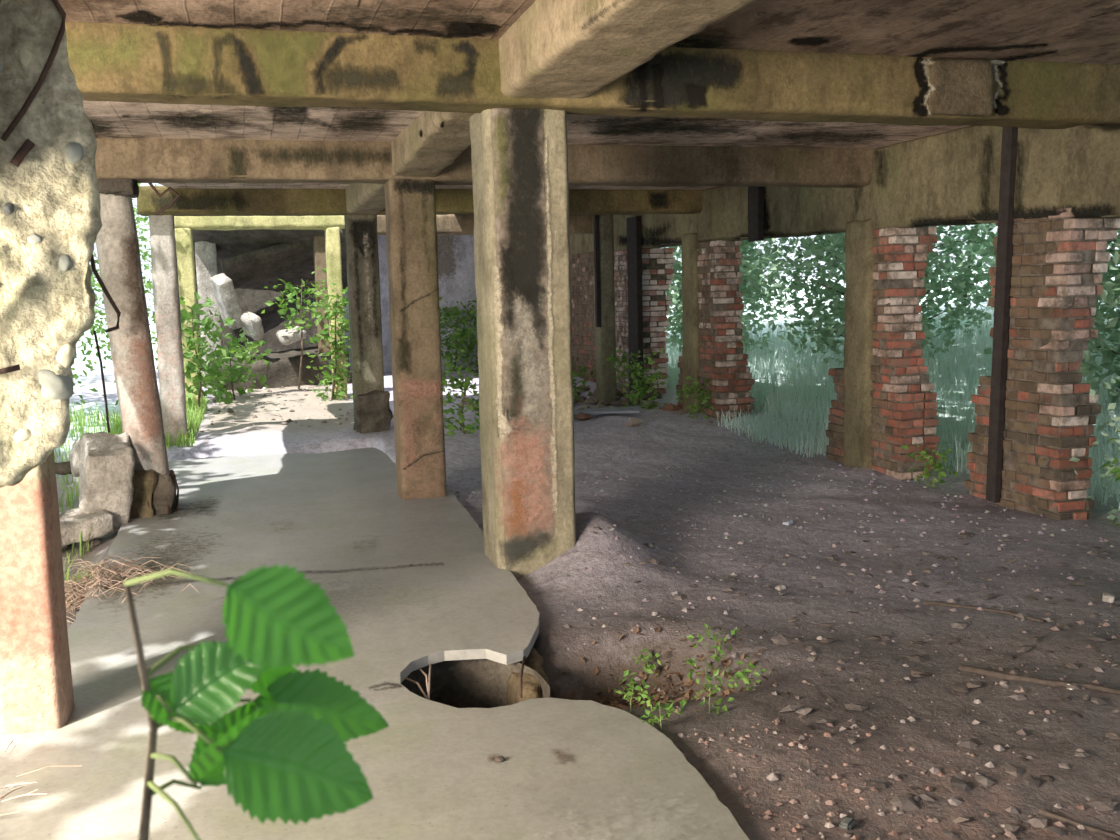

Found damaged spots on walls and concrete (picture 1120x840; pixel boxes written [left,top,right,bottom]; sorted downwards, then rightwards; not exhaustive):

damp [156,32,264,97]
damp [314,6,485,96]
damp [91,117,113,135]
damp [123,107,386,132]
damp [570,28,885,186]
spalling [0,0,121,488]
damp [501,108,545,349]
damp [510,355,522,417]
spalling [506,647,549,705]